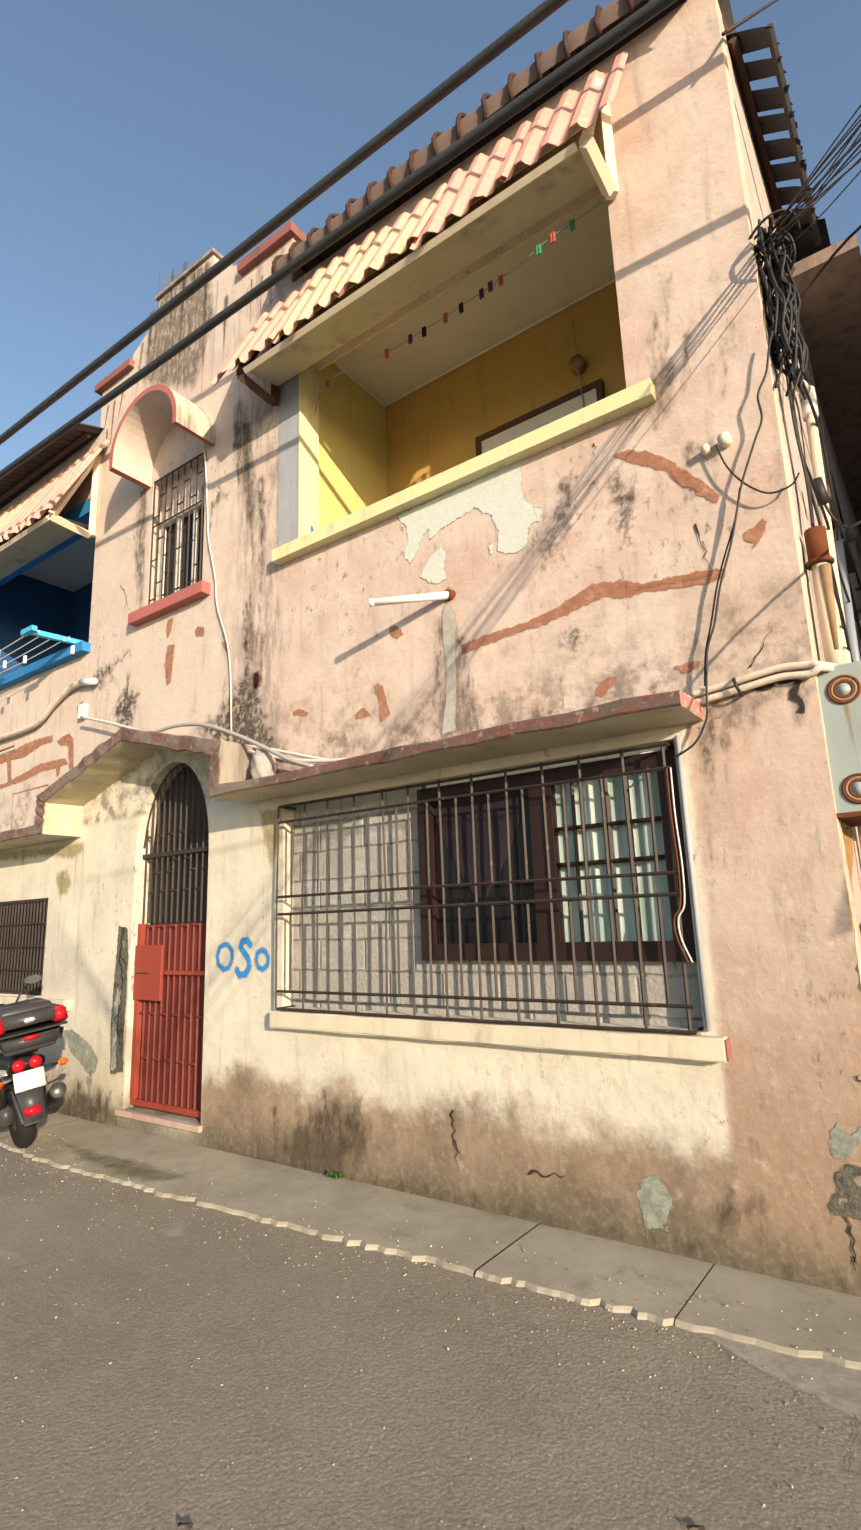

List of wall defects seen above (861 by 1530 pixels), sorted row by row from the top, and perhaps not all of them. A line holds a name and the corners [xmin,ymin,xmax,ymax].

damp [234,404,264,564]
peeling [397,460,543,584]
damp [199,604,273,748]
damp [293,1094,365,1172]
peeling [637,1176,672,1232]
spalling [828,1122,861,1220]